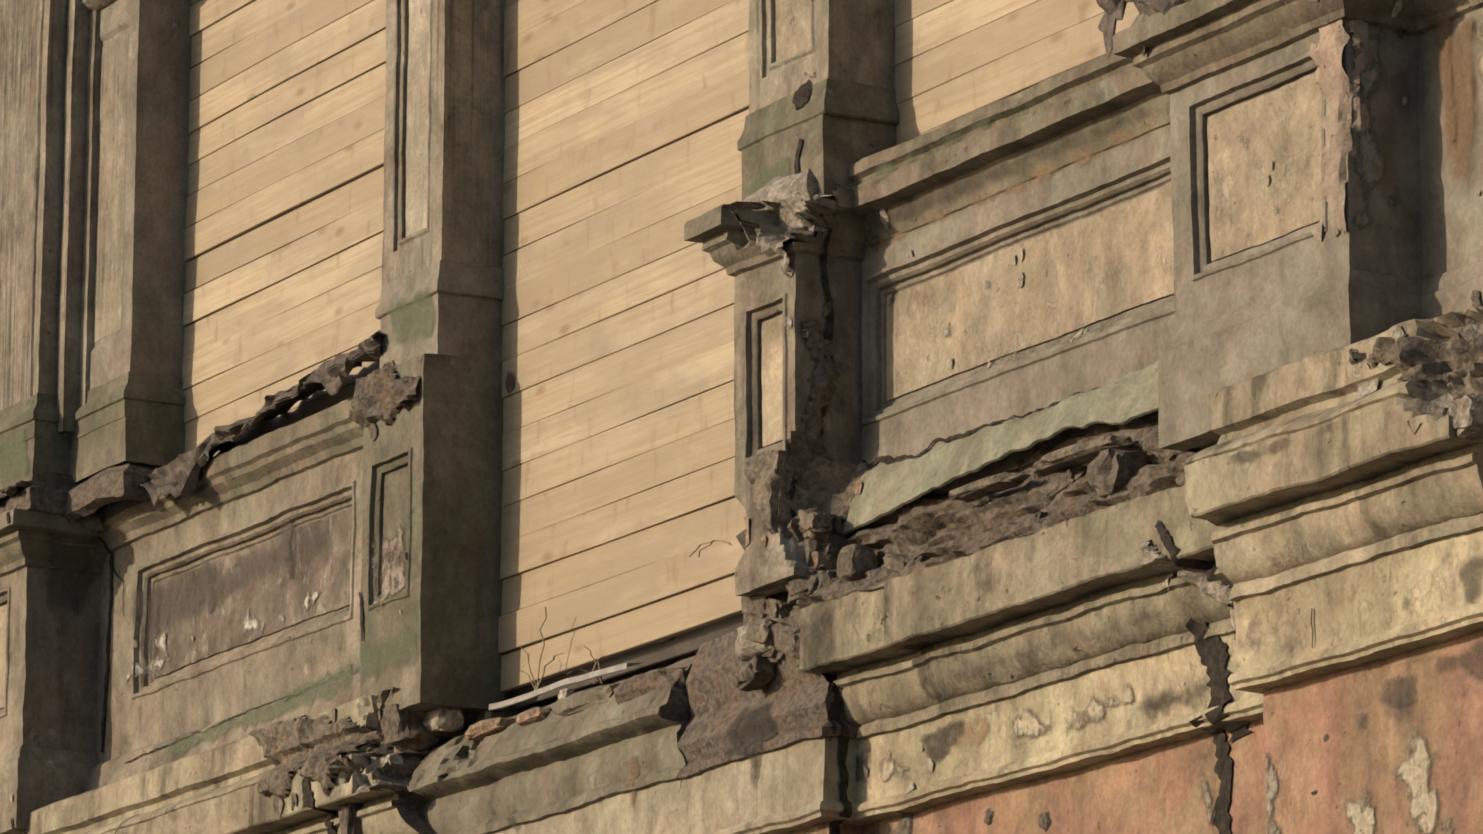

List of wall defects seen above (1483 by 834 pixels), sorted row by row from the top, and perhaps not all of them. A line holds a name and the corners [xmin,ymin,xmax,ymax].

spalling [1309,19,1373,241]
spalling [729,192,831,278]
spalling [880,208,889,229]
spalling [1349,290,1483,434]
spalling [735,410,1196,692]
crack [1154,519,1233,588]
crack [97,536,338,764]
crack [357,592,365,641]
spalling [248,707,394,818]
crack [1185,616,1251,834]
peeling [1345,794,1375,834]
peeling [1393,733,1453,834]